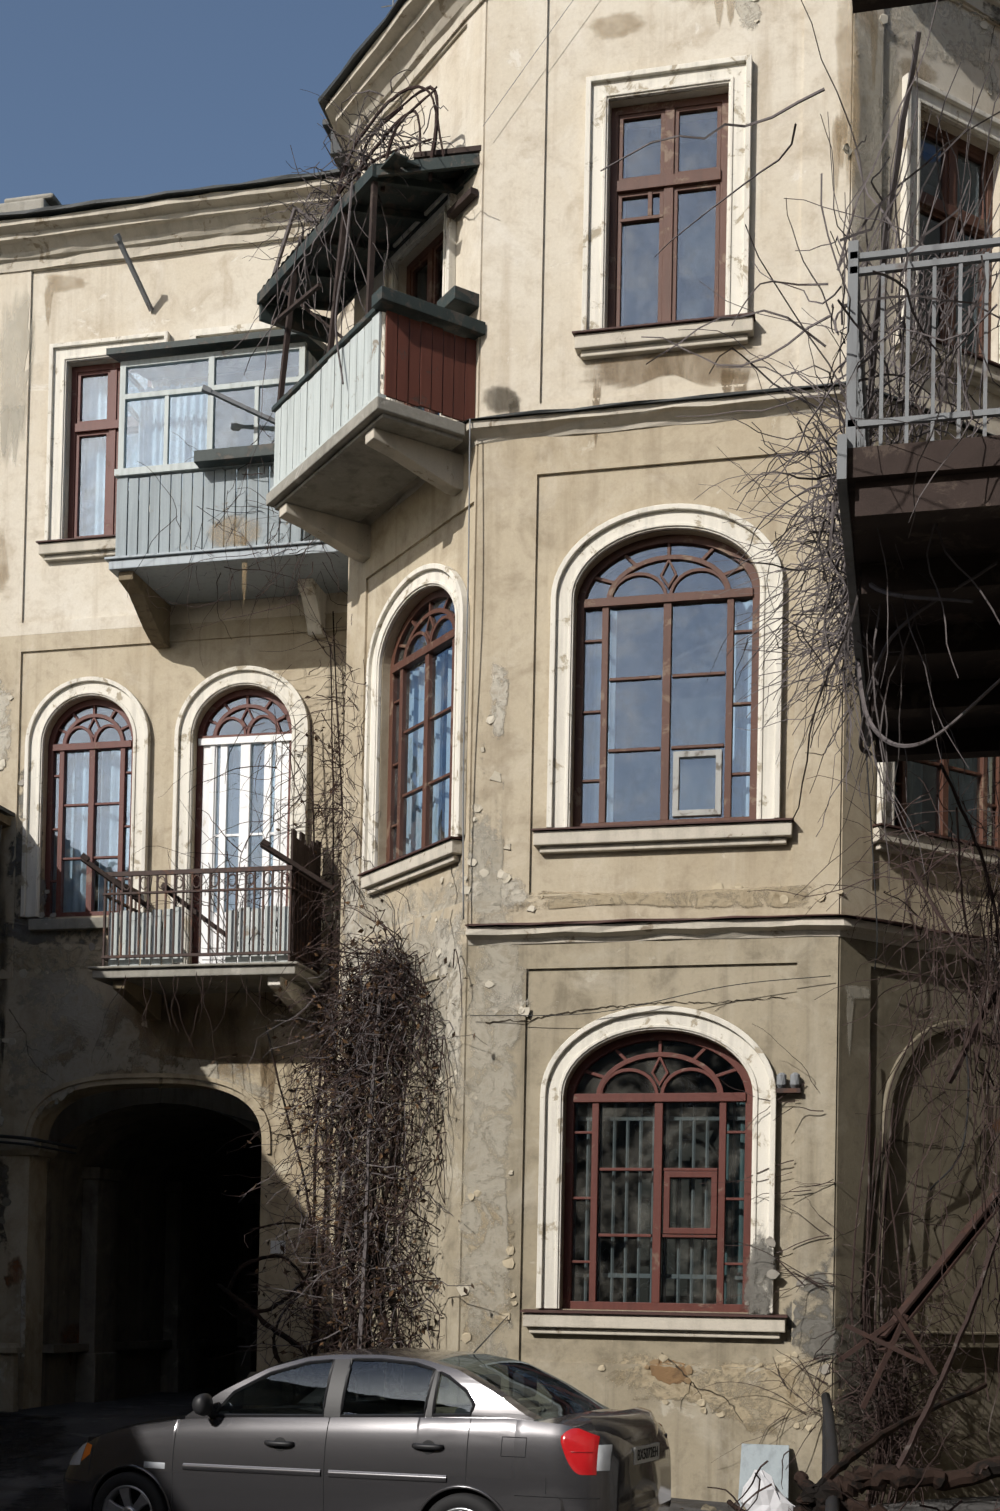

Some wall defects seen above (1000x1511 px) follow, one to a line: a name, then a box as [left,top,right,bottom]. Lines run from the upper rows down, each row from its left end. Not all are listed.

flaking render [879,1,997,66]
flaking render [0,680,14,771]
flaking render [435,817,843,1089]
water stain [0,905,276,1114]
flaking render [0,1155,11,1249]